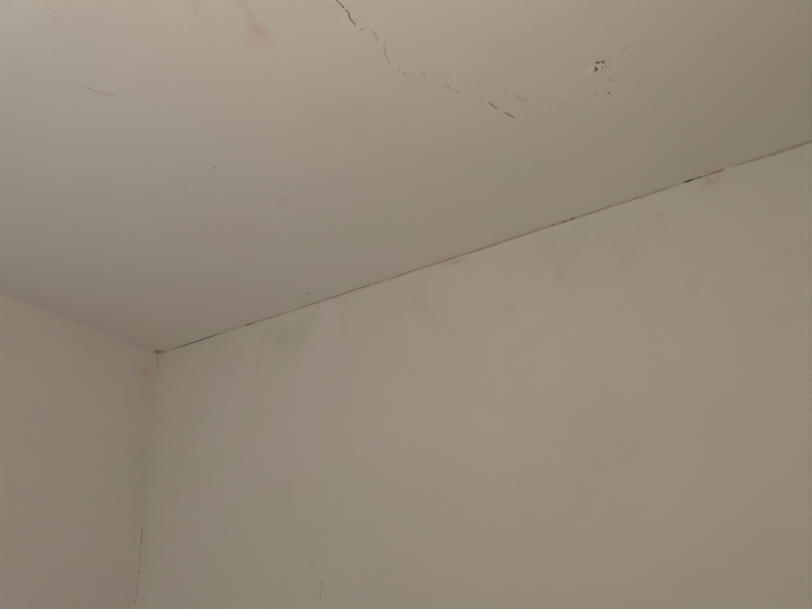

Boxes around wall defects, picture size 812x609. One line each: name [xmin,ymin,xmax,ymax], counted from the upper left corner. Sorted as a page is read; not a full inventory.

crack [336,0,406,76]